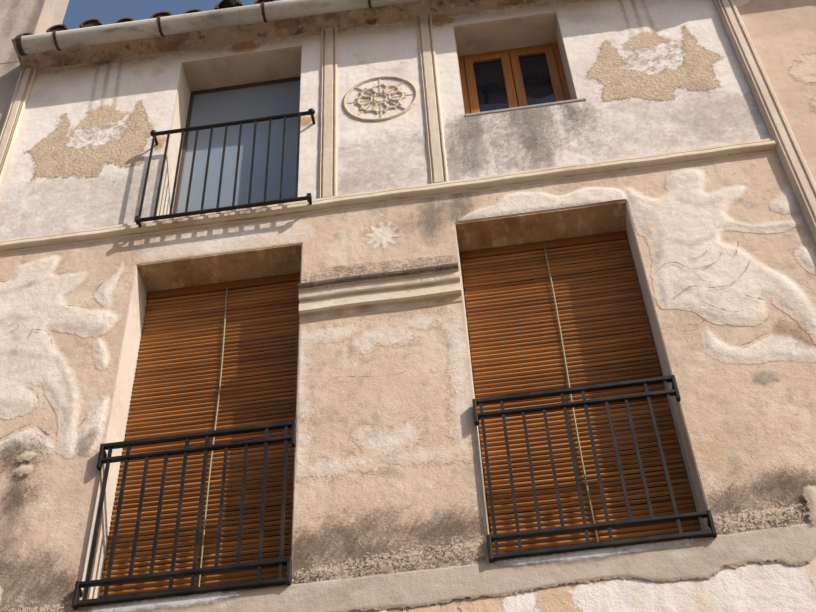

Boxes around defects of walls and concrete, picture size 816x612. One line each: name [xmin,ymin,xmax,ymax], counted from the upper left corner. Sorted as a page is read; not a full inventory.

peeling [586,25,724,103]
peeling [24,99,155,181]
crack [662,244,765,325]
water stain [0,437,48,526]
water stain [707,464,816,534]
water stain [0,543,83,612]
water stain [292,506,488,585]